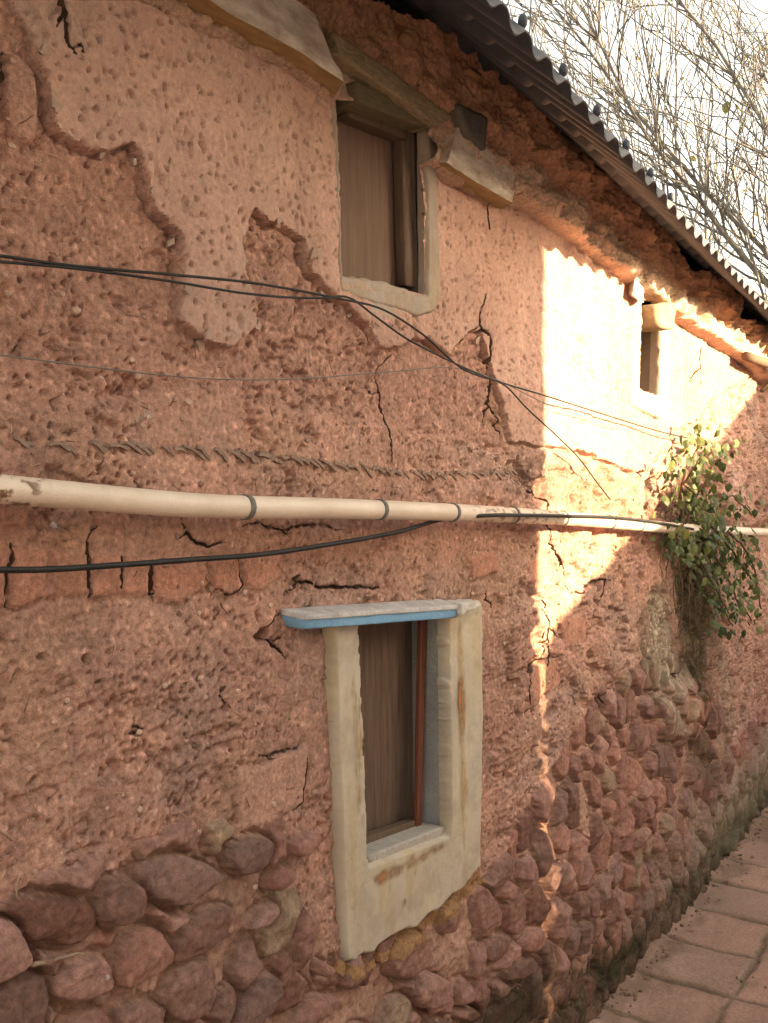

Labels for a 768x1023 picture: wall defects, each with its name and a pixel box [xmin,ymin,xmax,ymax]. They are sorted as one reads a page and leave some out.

spalling [0,120,516,460]
crack [368,351,393,459]
crack [458,294,500,435]
crack [4,542,15,608]
crack [85,526,98,598]
crack [117,556,125,589]
crack [147,566,155,601]
crack [179,523,243,596]
crack [243,521,344,535]
crack [253,575,379,659]
crack [526,599,562,715]
crack [526,490,611,603]